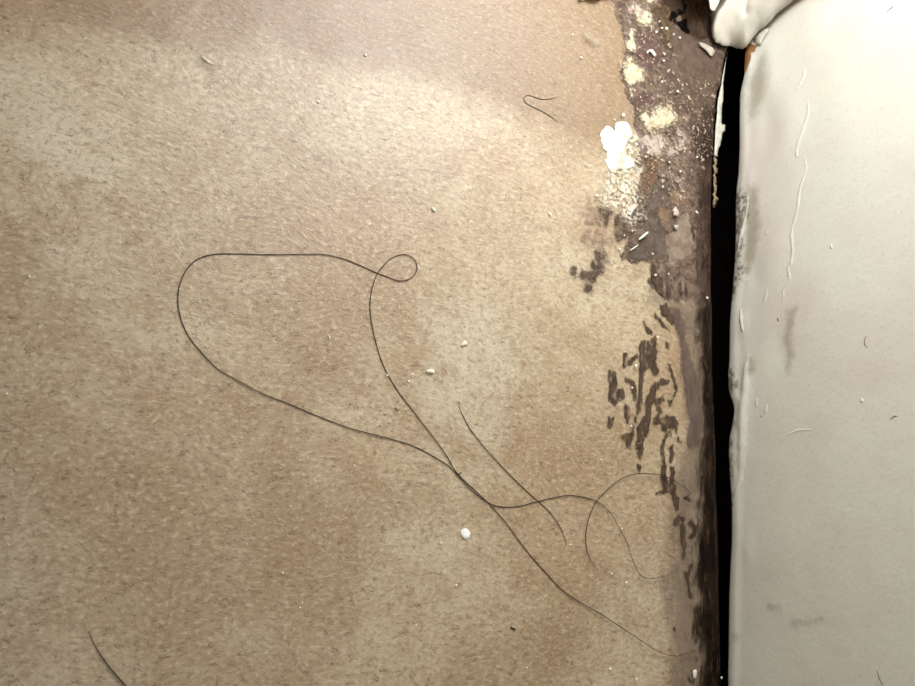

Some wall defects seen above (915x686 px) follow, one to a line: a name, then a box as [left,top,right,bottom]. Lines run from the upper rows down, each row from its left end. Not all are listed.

spalling [669,0,690,33]
peeling [709,0,793,208]
water stain [571,0,728,686]